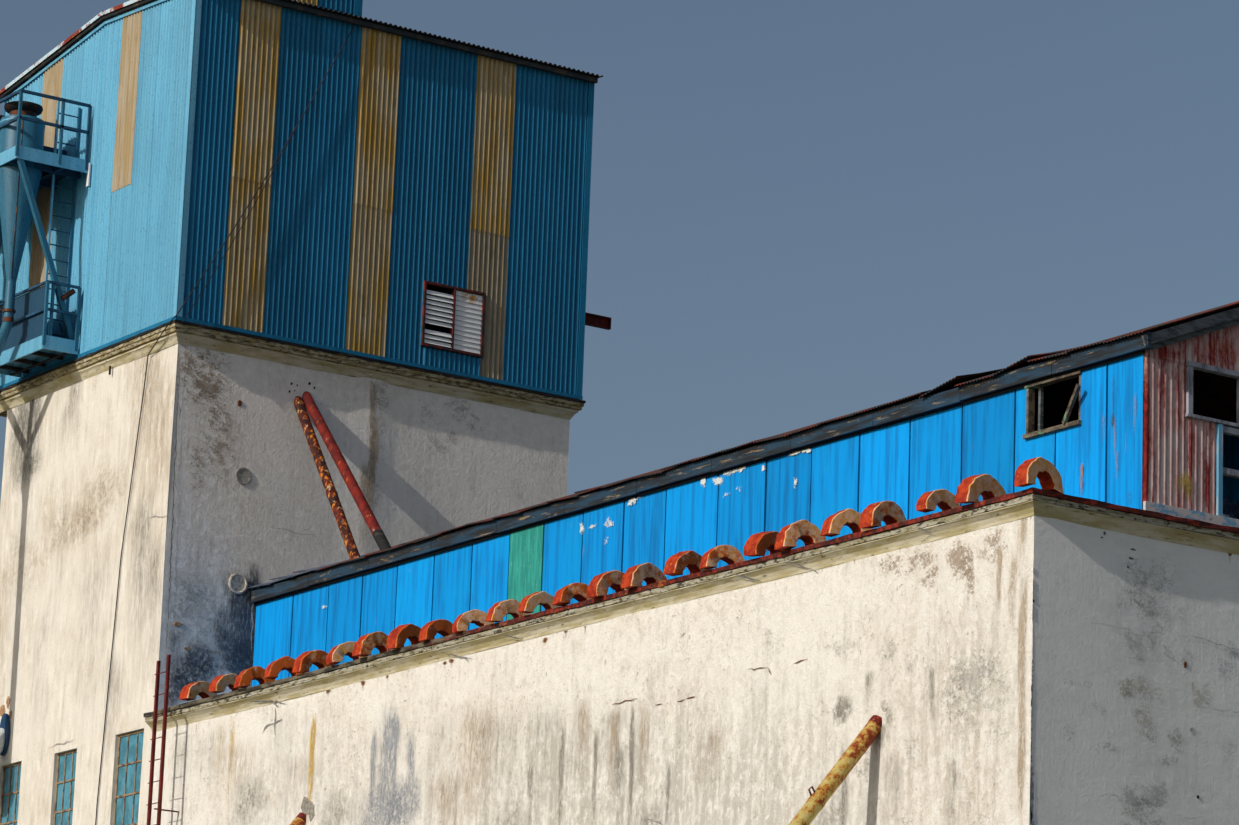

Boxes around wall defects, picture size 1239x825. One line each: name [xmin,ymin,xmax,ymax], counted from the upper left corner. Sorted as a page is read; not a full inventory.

peeling [176,349,242,493]
leakage [168,569,259,705]
leakage [363,716,417,825]
leakage [592,709,646,812]